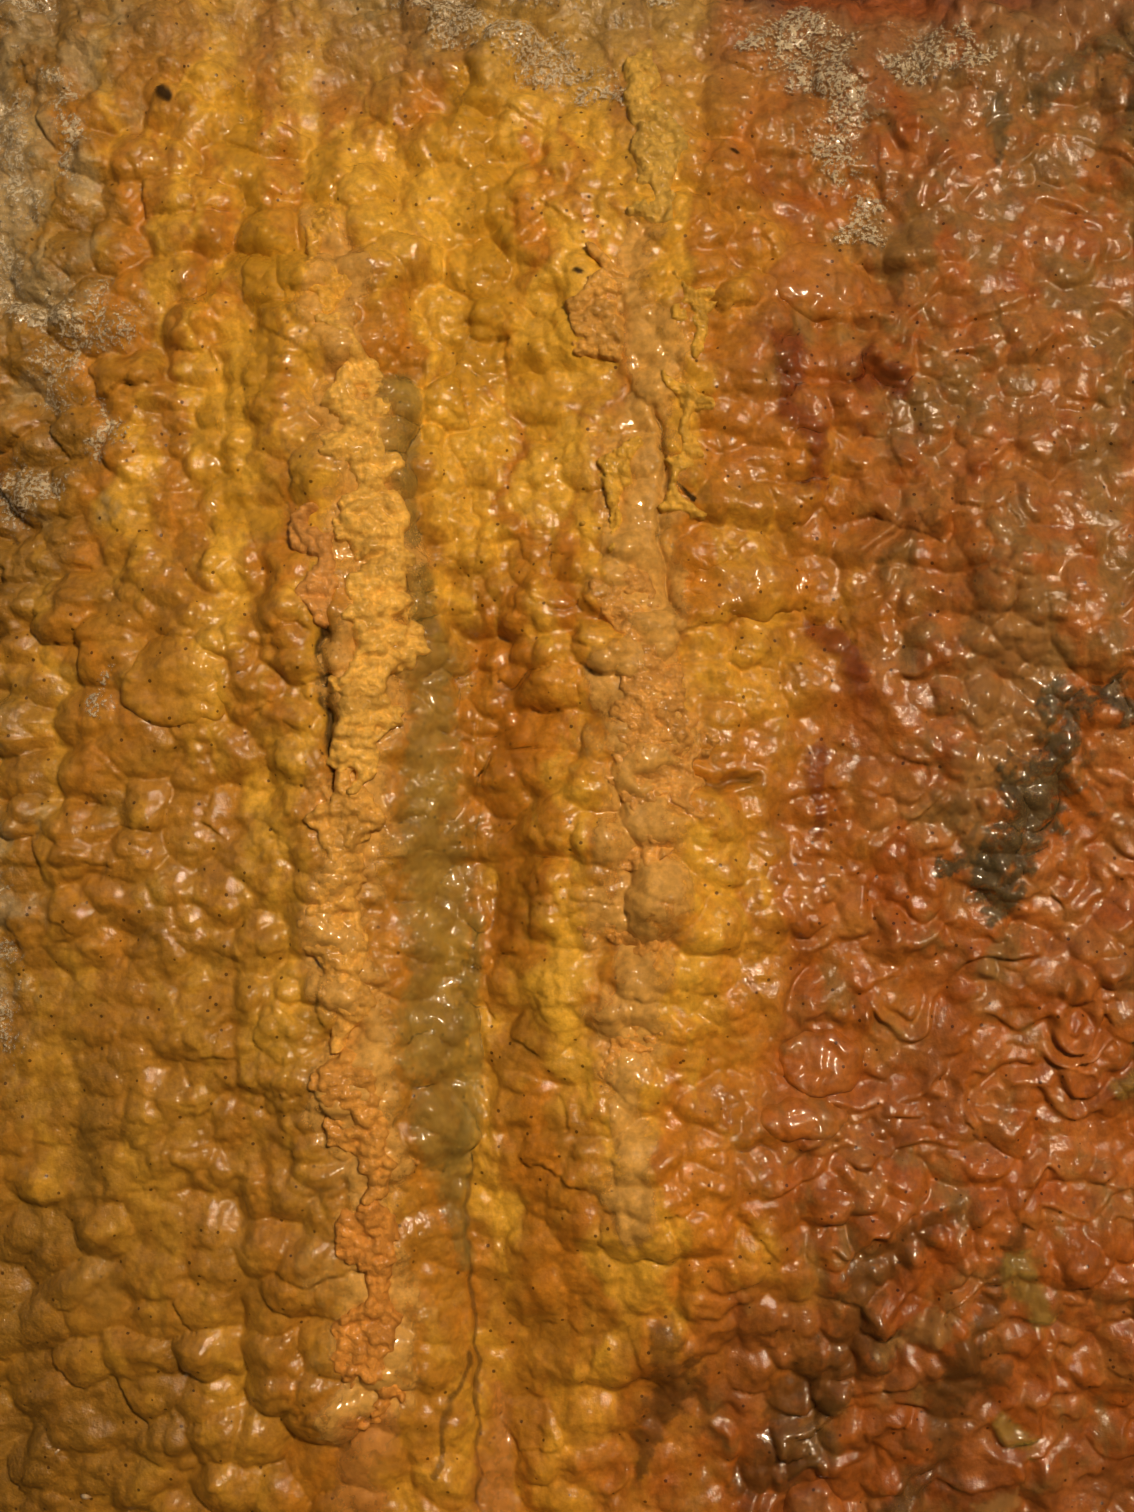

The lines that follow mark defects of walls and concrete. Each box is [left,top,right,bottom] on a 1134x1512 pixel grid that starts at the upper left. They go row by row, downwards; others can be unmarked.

efflorescence [0,0,57,68]
efflorescence [877,18,997,85]
efflorescence [734,6,898,247]
efflorescence [0,65,145,461]
efflorescence [0,452,75,530]
efflorescence [85,664,115,717]
water stain [933,670,1134,927]
efflorescence [0,939,27,1066]